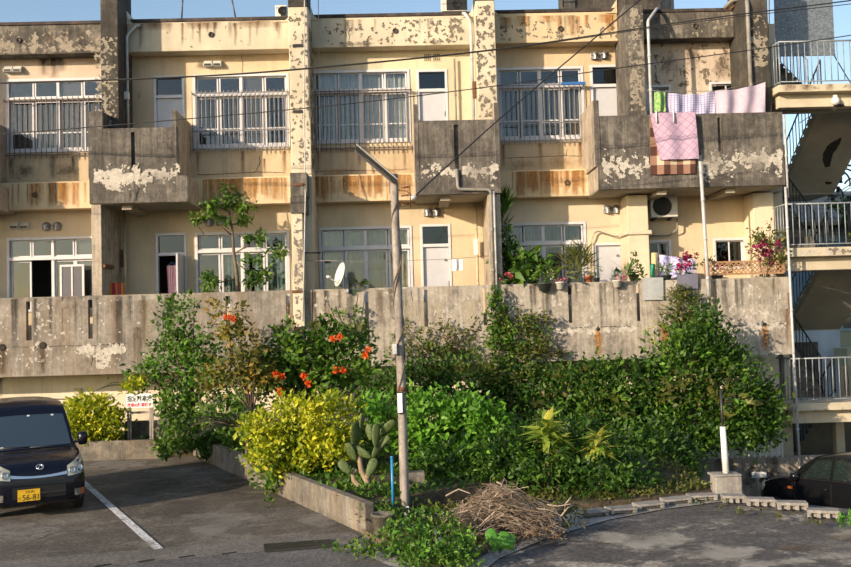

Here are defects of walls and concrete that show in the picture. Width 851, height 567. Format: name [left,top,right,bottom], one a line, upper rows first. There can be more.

spalling [322,18,464,45]
peeling [0,30,118,125]
spalling [288,11,316,172]
spalling [475,5,646,117]
peeling [93,162,180,192]
corrosion [203,178,286,201]
corrosion [315,174,411,195]
peeling [421,161,499,187]
corrosion [512,170,584,191]
peeling [602,148,650,184]
peeling [698,147,783,182]
peeling [0,302,126,370]